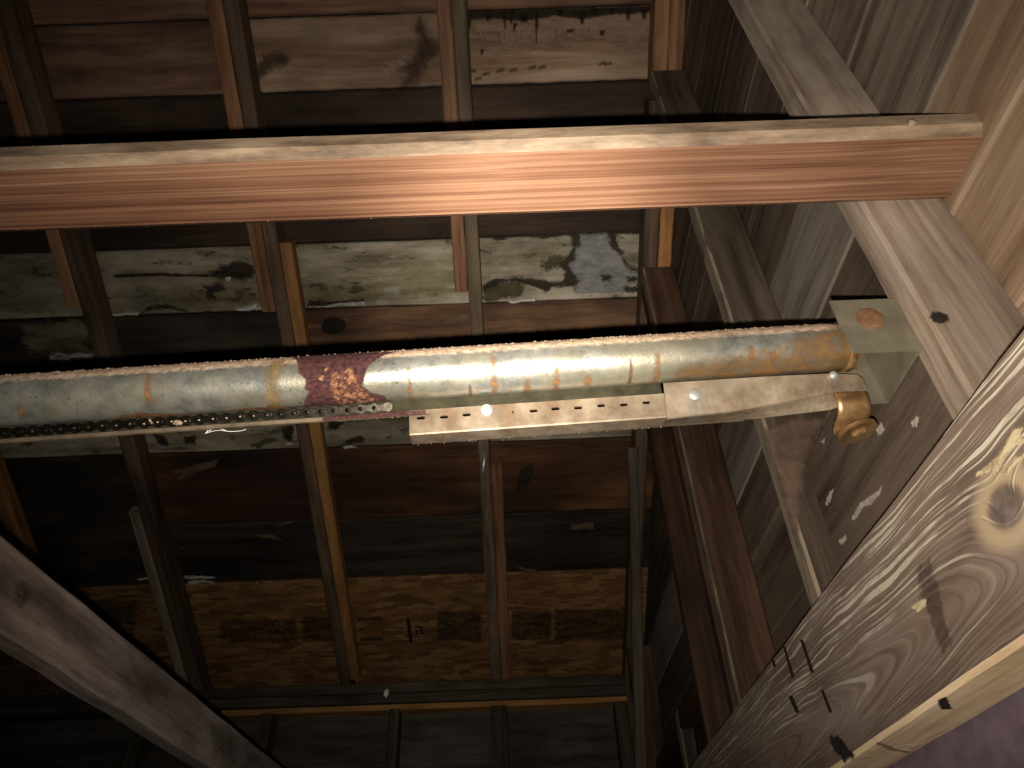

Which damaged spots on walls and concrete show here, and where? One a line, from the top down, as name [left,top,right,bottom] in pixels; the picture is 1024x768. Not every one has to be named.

damp [468,6,650,38]
damp [203,262,254,300]
damp [482,230,639,302]
corrosion [686,333,851,378]
corrosion [229,352,426,421]